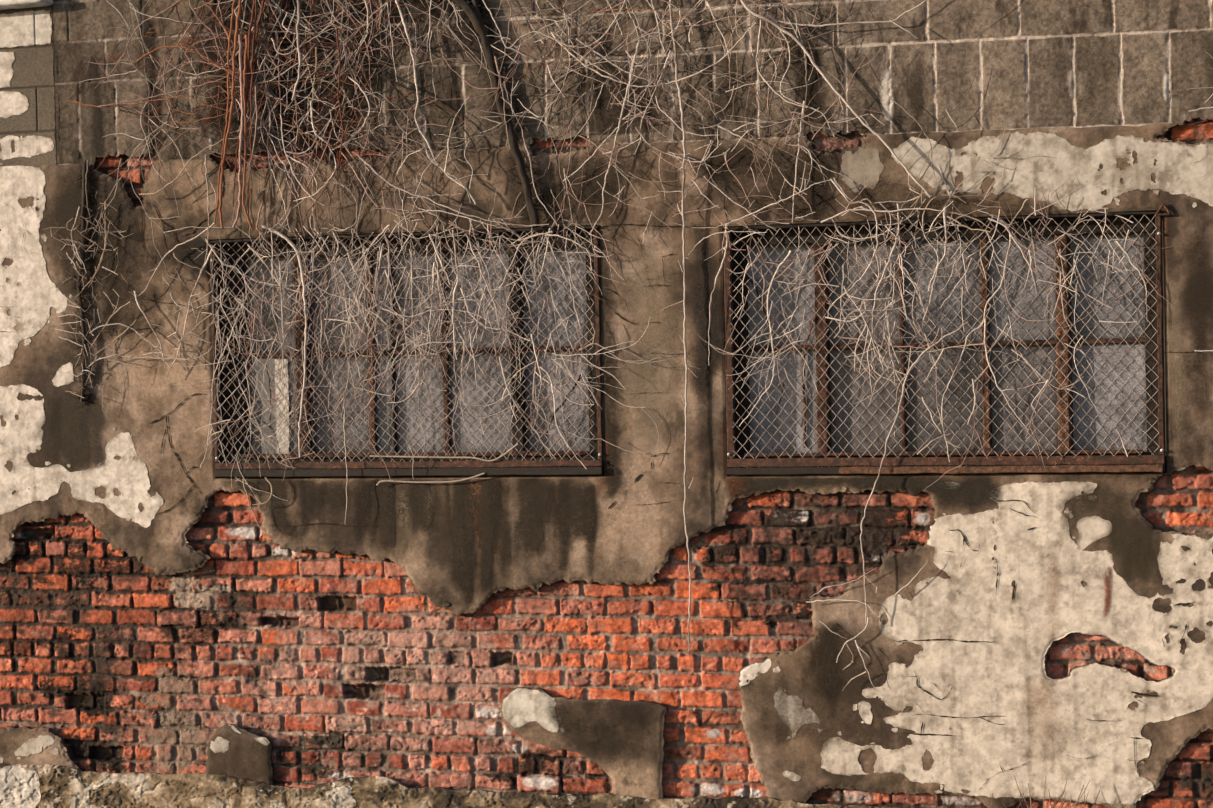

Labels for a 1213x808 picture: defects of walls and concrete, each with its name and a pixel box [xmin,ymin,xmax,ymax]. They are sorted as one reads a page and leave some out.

peeling [0,10,52,118]
spalling [96,153,156,207]
peeling [808,118,1213,212]
peeling [0,135,72,368]
peeling [52,362,74,387]
crack [148,393,205,515]
water stain [237,259,620,605]
water stain [692,231,720,402]
spalling [0,384,1213,808]